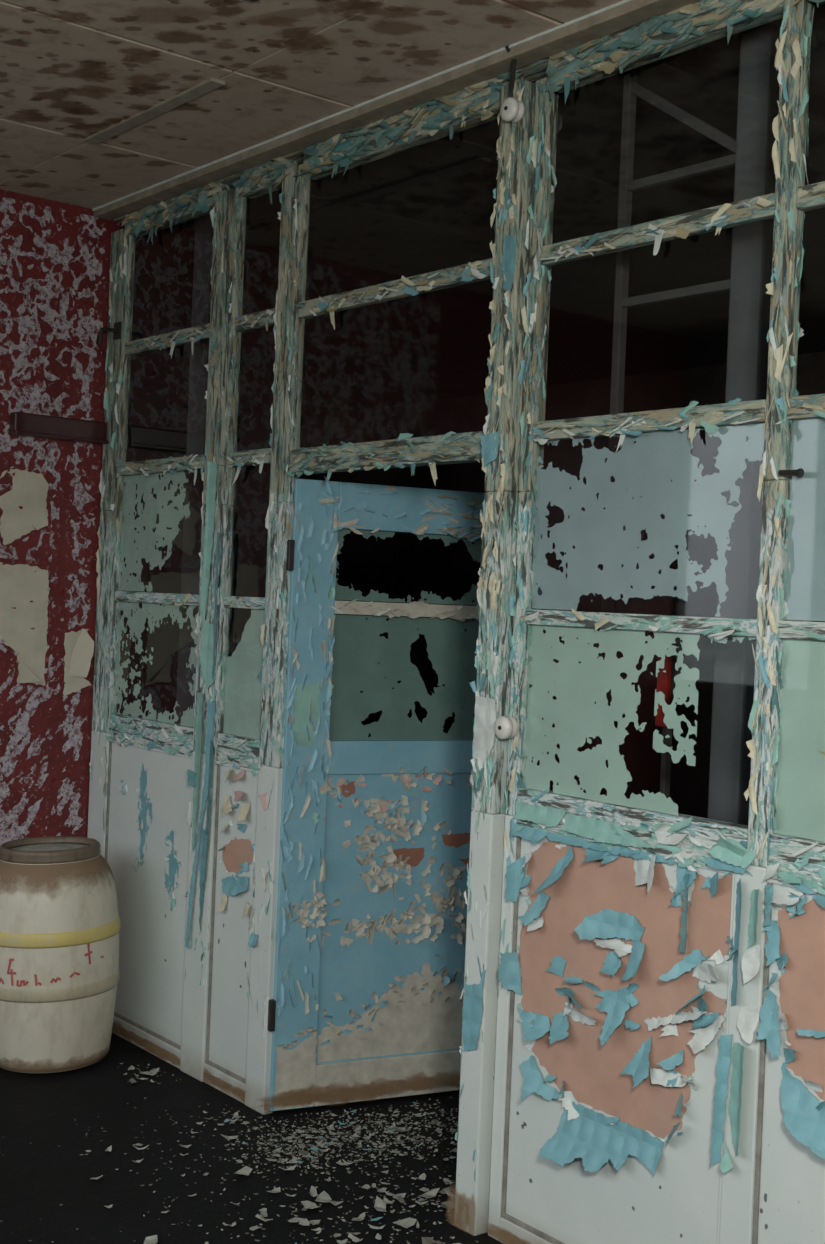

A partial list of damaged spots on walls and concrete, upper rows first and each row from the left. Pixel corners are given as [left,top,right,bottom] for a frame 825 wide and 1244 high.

leakage [0,0,337,167]
leakage [323,0,457,66]
leakage [457,0,592,28]
peeling [204,0,825,1177]